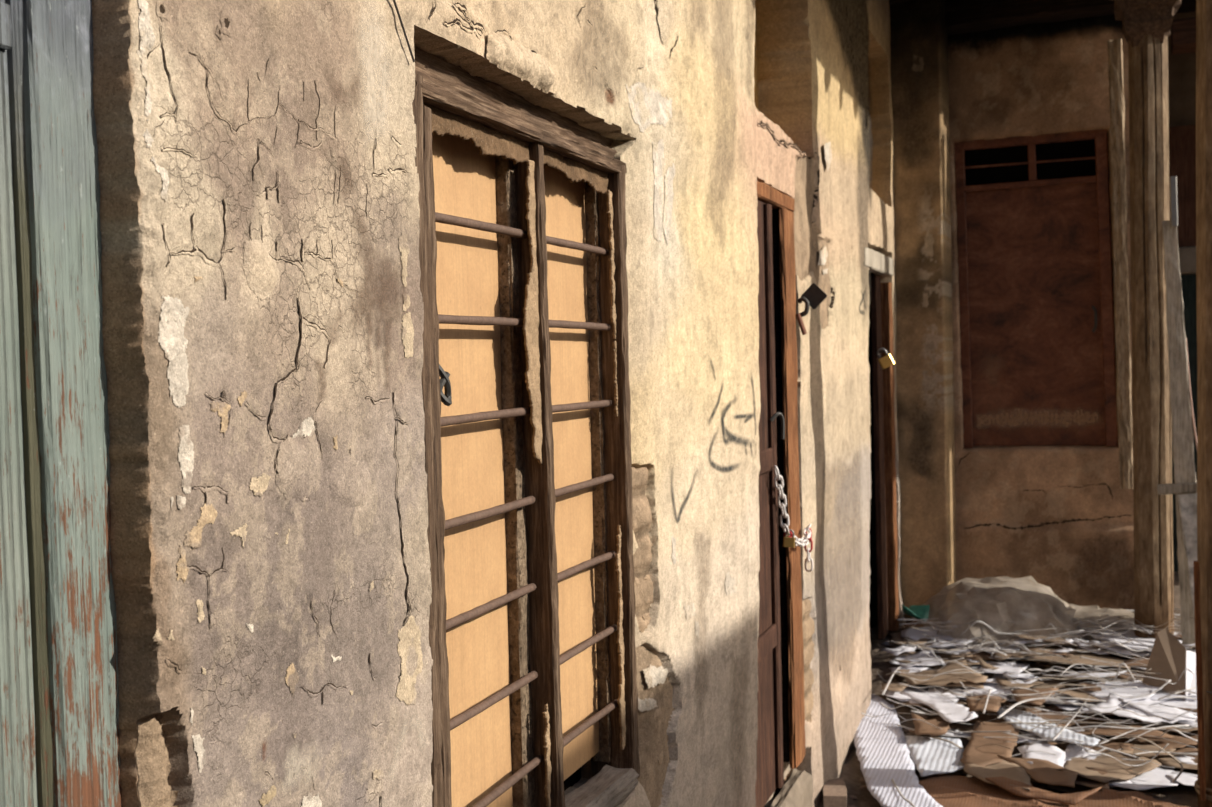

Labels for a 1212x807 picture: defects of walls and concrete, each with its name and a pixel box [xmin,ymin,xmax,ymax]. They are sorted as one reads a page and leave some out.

flaking render [137,0,169,203]
crack [430,0,537,58]
crack [593,0,679,98]
flaking render [158,295,190,408]
crack [147,25,407,502]
crack [755,113,853,325]
crack [366,391,412,626]
crack [965,483,1133,530]
flaking render [396,615,423,705]
flaking render [632,467,675,807]